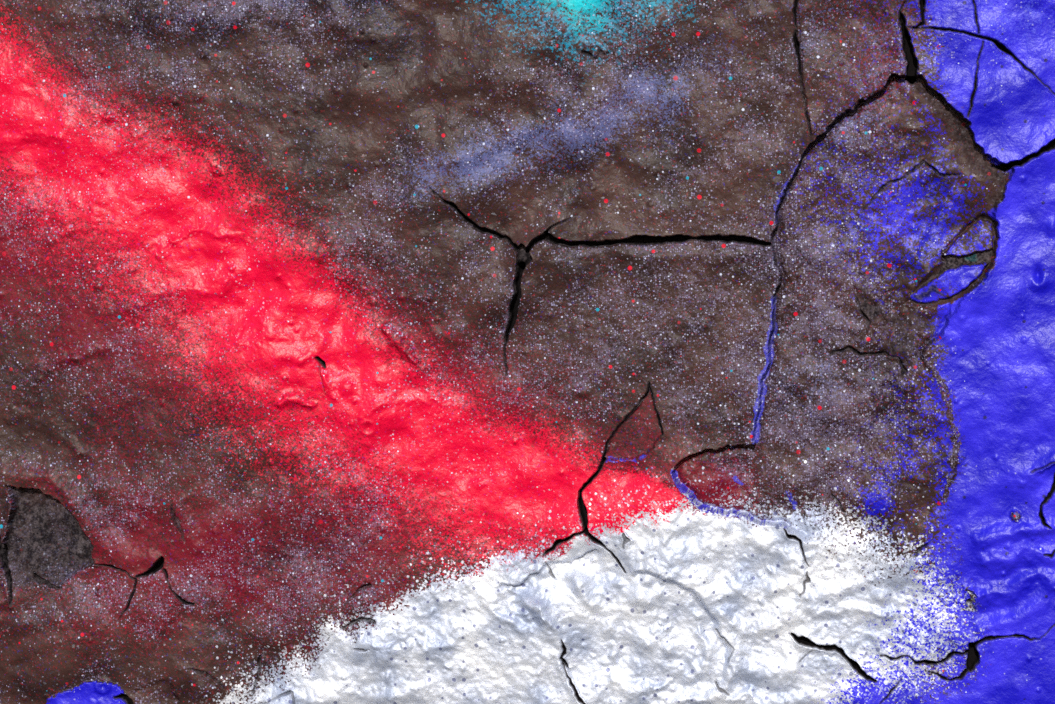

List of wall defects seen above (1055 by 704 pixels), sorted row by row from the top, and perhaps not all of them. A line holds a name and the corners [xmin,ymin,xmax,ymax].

crack [791,0,813,137]
crack [896,0,1055,120]
crack [990,138,1055,173]
crack [427,186,772,378]
spalling [0,485,94,610]
crack [541,380,666,575]
crack [1029,460,1055,561]
crack [789,623,1055,704]